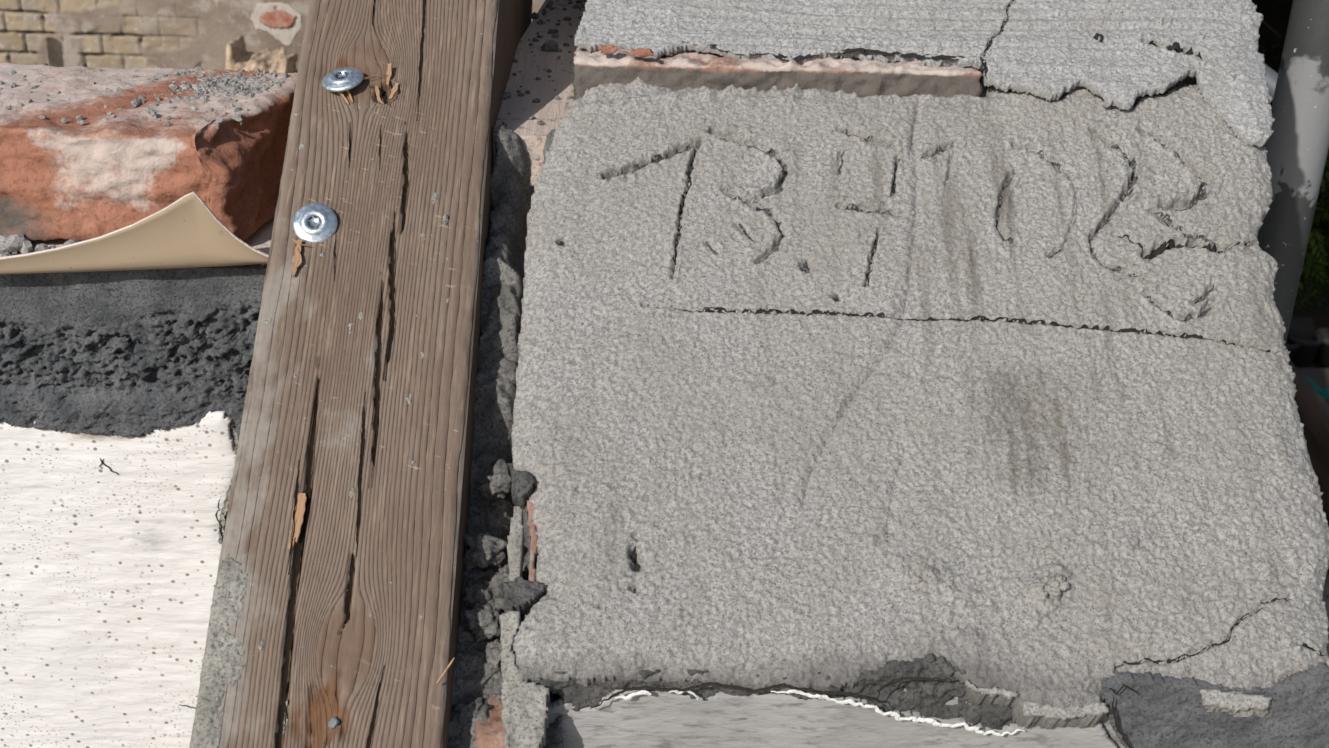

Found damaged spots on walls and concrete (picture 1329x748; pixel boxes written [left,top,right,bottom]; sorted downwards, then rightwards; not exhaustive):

crack [682,0,1190,108]
spalling [499,468,1329,748]
crack [1109,598,1292,748]